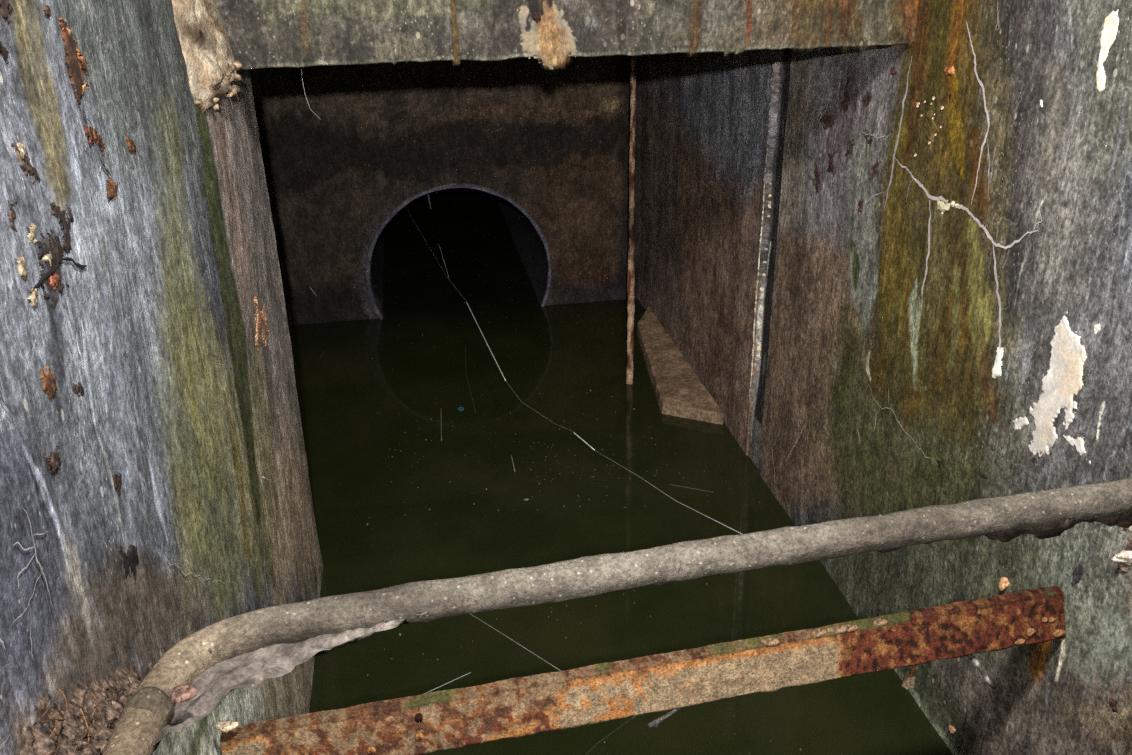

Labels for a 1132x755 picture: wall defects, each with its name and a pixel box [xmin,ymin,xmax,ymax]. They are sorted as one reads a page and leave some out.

spalling [516,0,578,69]
water stain [853,0,892,45]
peeling [1096,9,1119,93]
water stain [819,72,872,131]
crack [861,6,1042,379]
water stain [811,129,881,333]
peeling [1012,312,1100,464]
water stain [224,392,249,558]
rust [760,637,780,646]
rust [811,624,858,638]
rust [1015,617,1066,681]